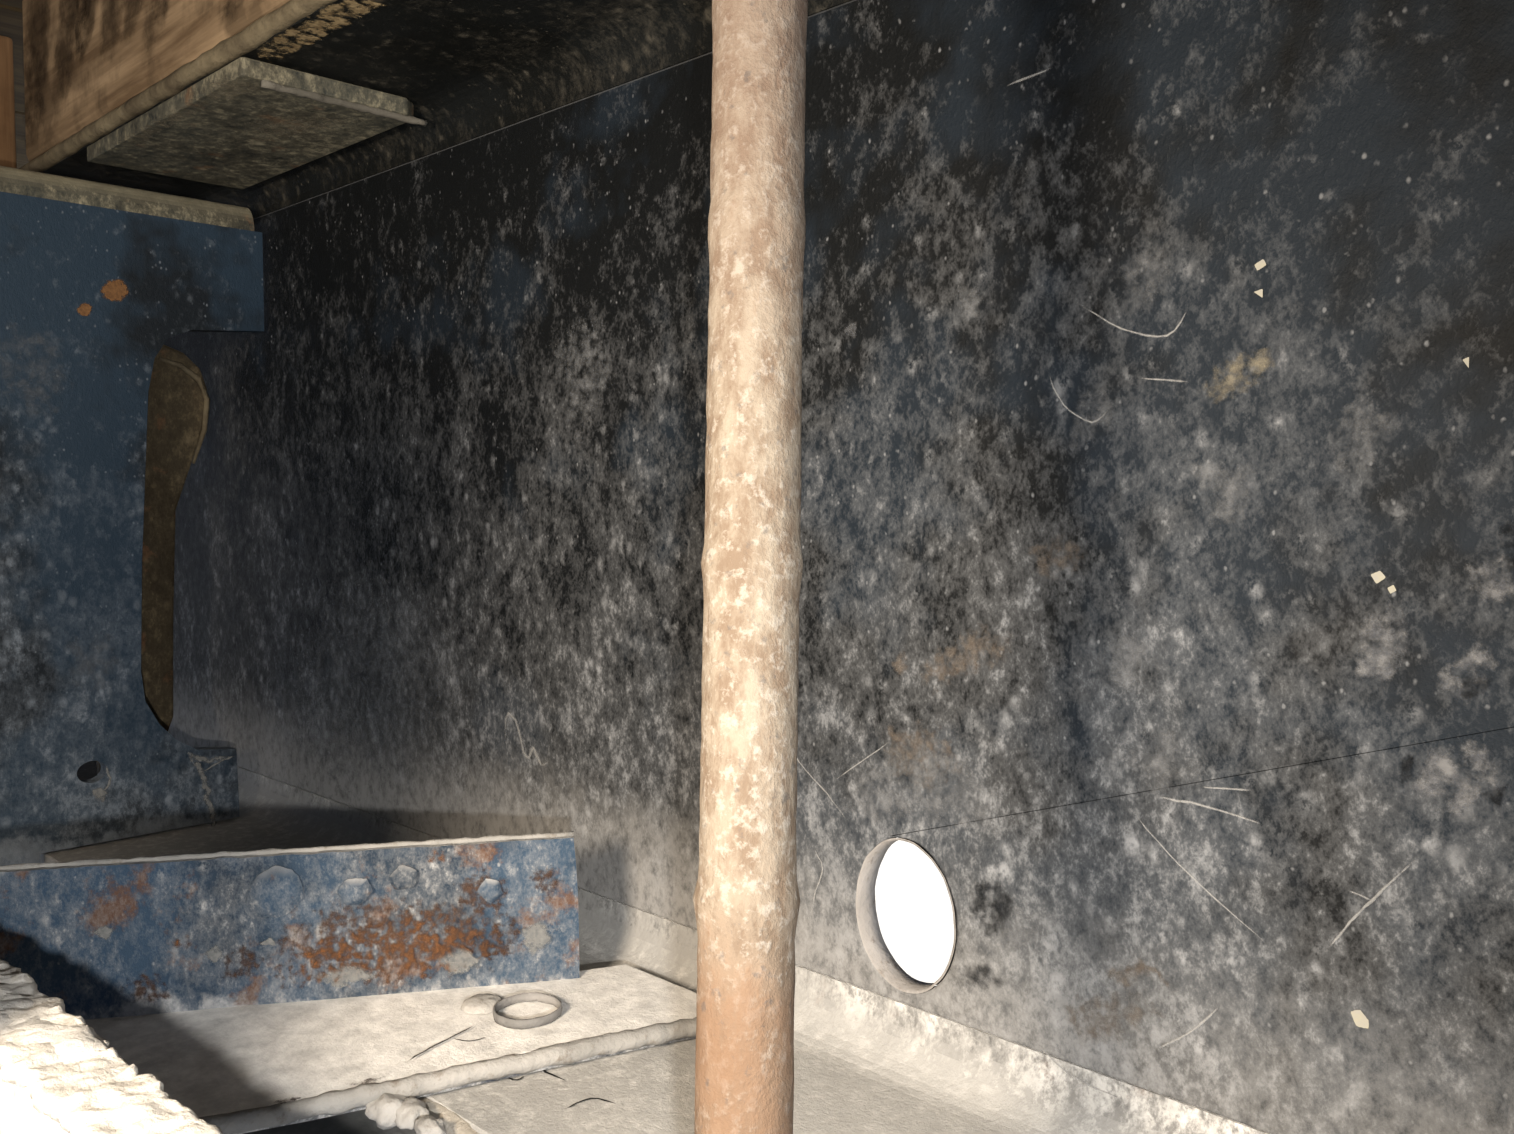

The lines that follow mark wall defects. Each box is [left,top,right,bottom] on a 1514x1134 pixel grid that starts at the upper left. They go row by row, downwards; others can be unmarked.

water stain [24,0,167,127]
rust [77,279,128,316]
water stain [1227,358,1267,385]
rust [530,869,558,901]
rust [278,869,520,983]
water stain [973,885,1029,942]
rust [225,946,259,978]
water stain [969,967,1000,983]